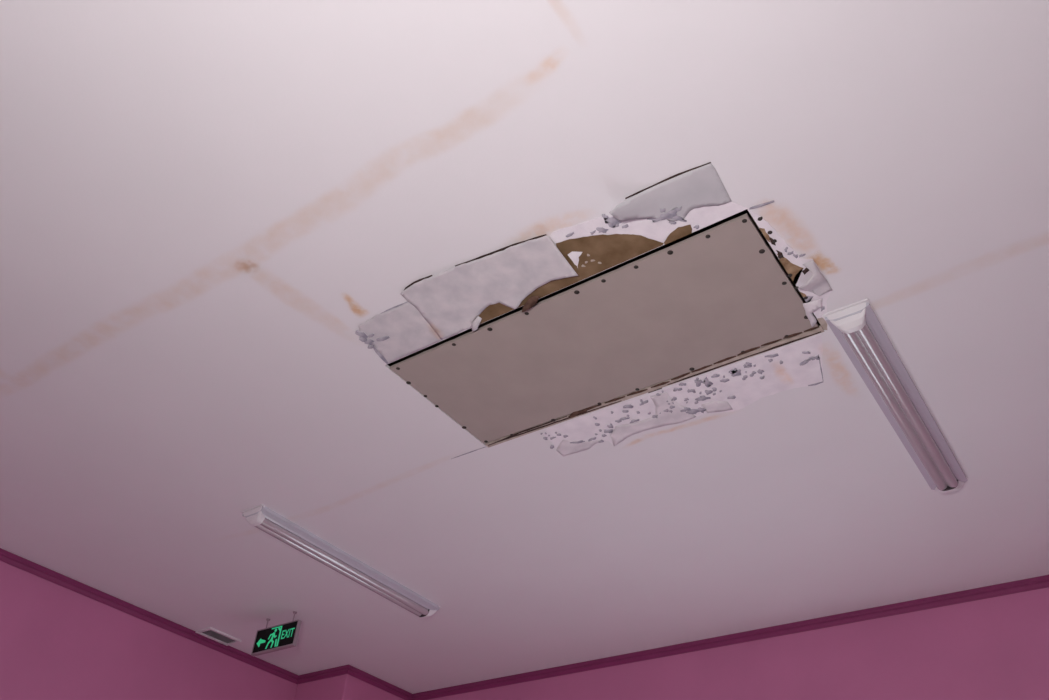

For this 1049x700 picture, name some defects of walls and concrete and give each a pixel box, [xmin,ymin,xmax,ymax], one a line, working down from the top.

peeling [355,162,832,456]